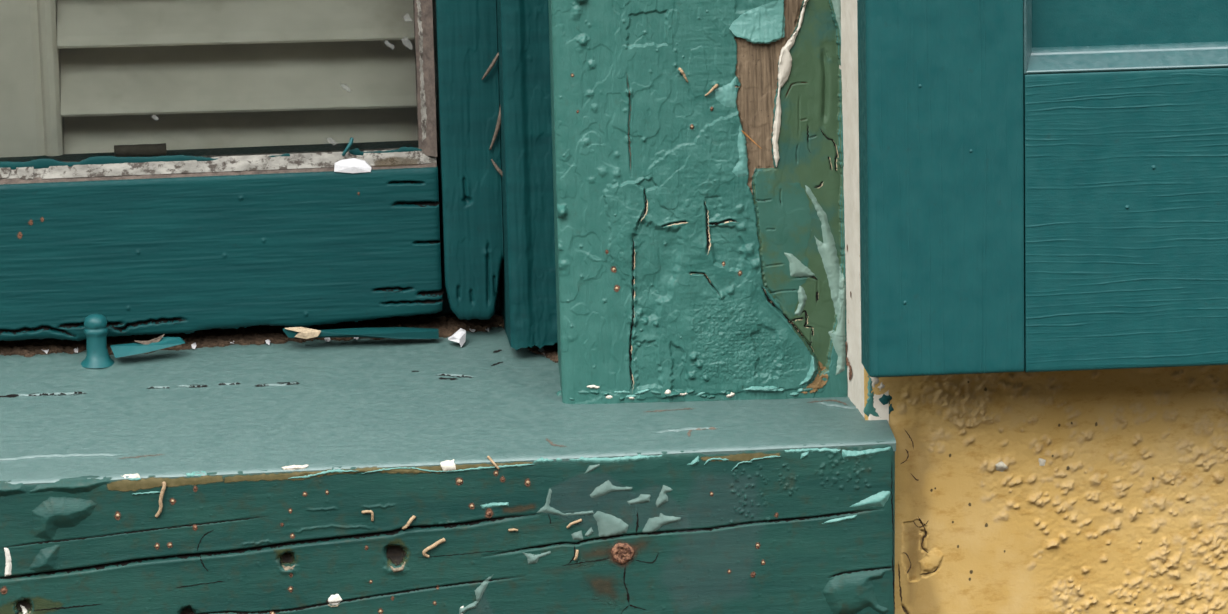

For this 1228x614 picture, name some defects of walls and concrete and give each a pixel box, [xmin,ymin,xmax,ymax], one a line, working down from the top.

flaking render [334,158,371,173]
peeling [715,0,846,396]
crack [627,76,782,437]
peeling [557,385,735,400]
peeling [107,454,662,495]
peeling [687,448,841,470]
crack [2,429,938,614]
peeling [480,480,681,540]